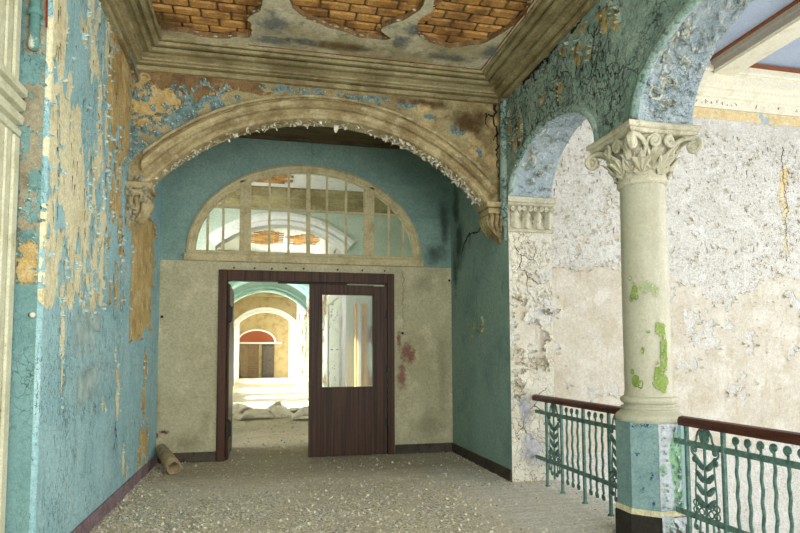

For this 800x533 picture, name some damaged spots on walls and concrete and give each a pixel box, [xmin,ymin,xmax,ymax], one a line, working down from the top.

peeling [15,0,614,533]
crack [515,240,546,300]
crack [485,6,620,180]
peeling [506,0,800,461]